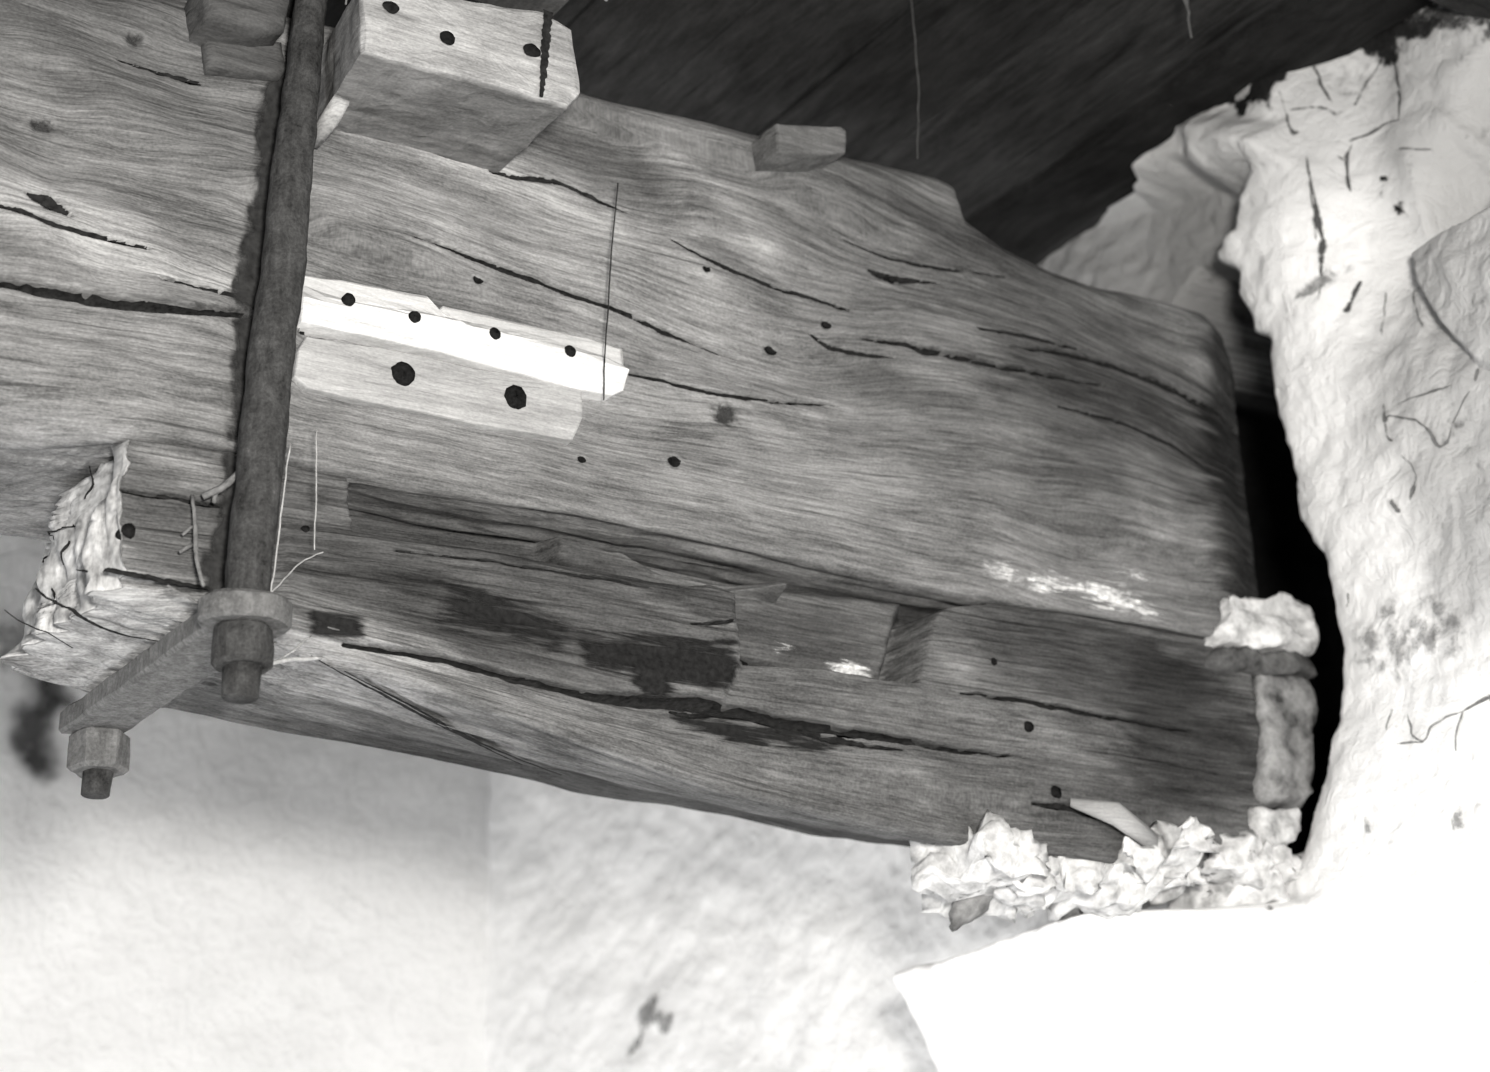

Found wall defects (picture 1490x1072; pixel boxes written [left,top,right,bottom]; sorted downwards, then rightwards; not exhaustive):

crack [118,60,201,86]
crack [0,192,244,318]
crack [403,233,718,355]
crack [628,373,835,407]
crack [670,238,1233,474]
leakage [435,583,739,701]
crack [690,618,735,626]
crack [311,643,1009,775]
leakage [672,713,838,752]
crack [960,693,1186,732]